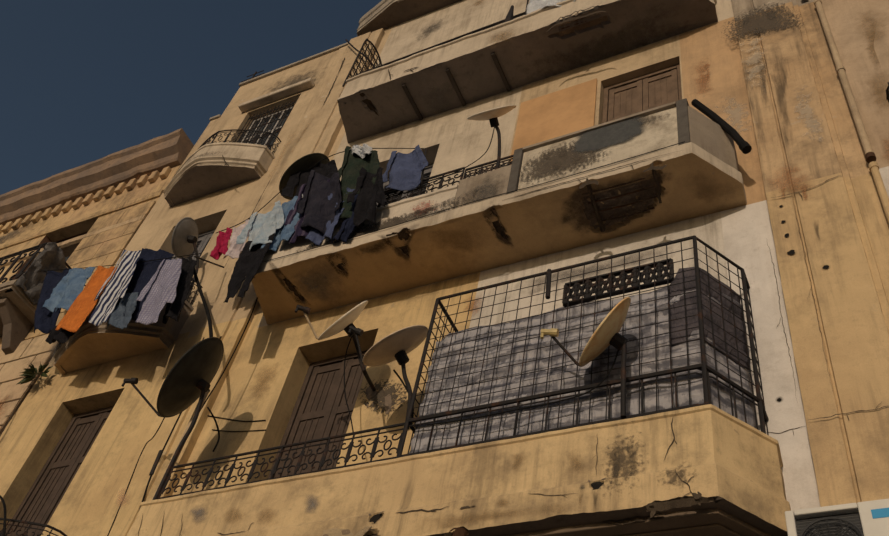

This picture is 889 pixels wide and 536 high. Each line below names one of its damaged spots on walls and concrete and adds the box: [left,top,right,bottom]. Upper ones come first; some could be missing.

water stain [574,115,660,152]
crack [771,175,840,386]
crack [767,244,797,400]
crack [766,403,887,435]
water stain [606,436,643,487]
crack [664,418,697,499]
peeling [322,526,378,536]
spalling [603,492,714,525]